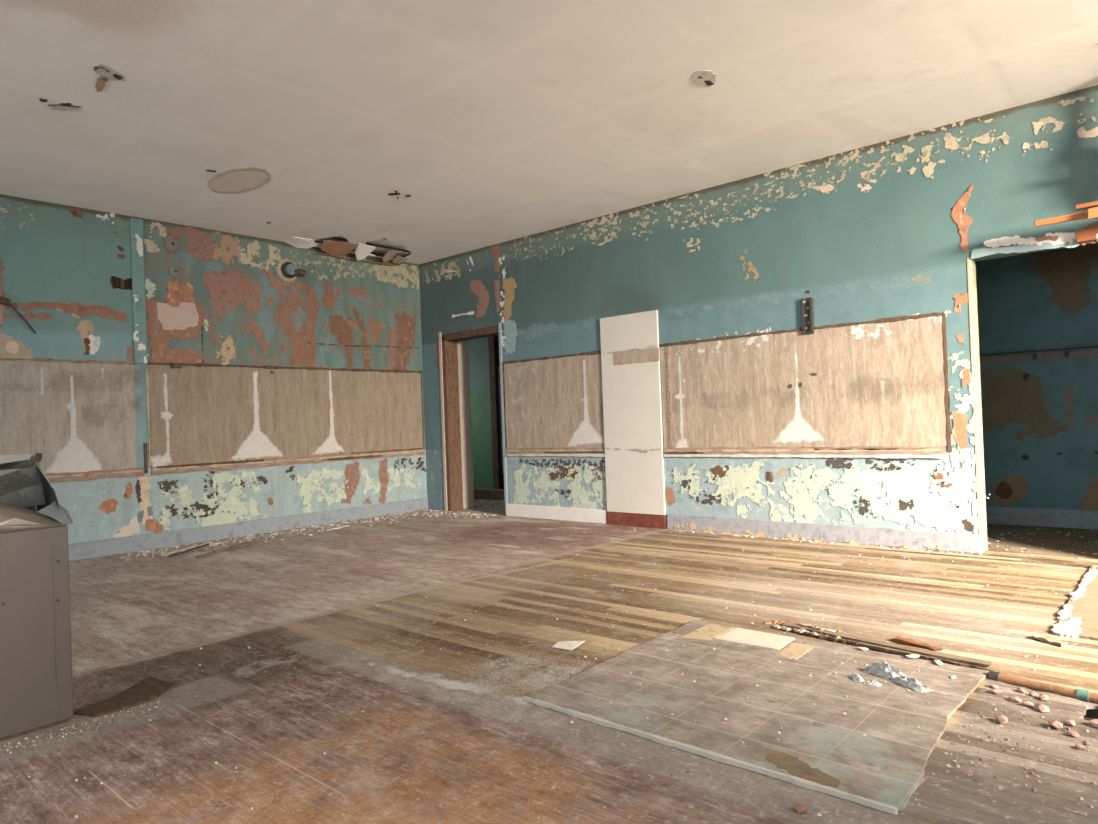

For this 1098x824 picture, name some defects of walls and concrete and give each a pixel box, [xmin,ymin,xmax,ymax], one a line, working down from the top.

spalling [92,64,125,92]
peeling [1022,96,1098,156]
spalling [68,208,119,233]
flaking render [470,113,1010,510]
peeling [951,184,1098,314]
flaking render [0,222,426,538]
flaking render [660,293,1098,541]